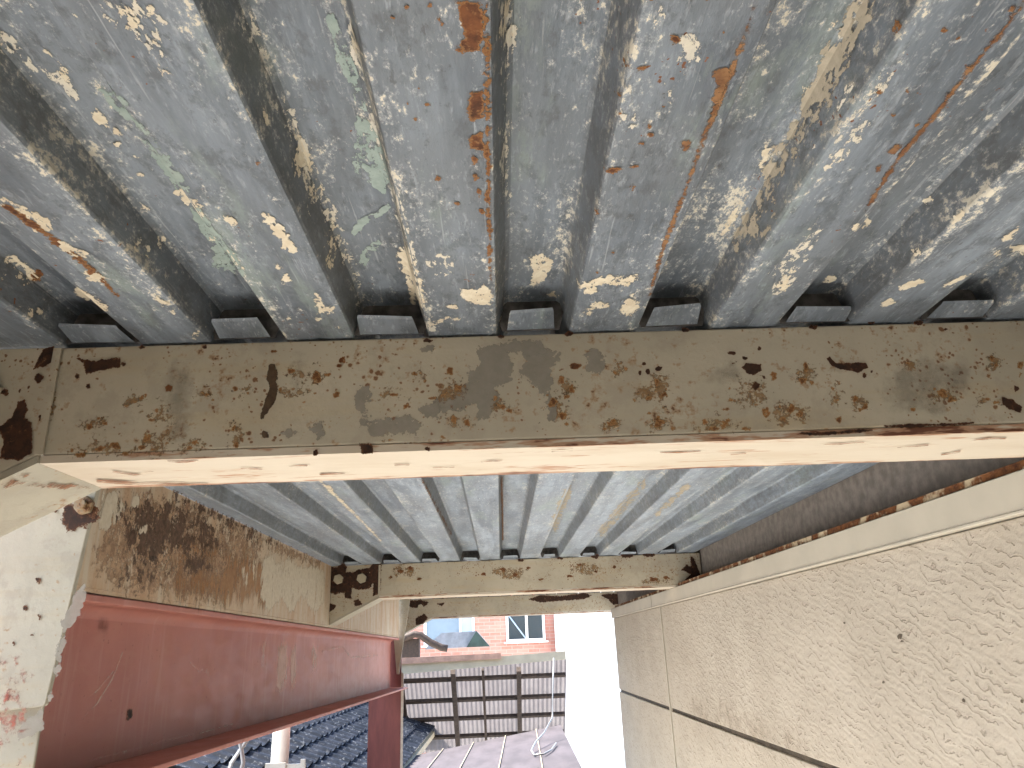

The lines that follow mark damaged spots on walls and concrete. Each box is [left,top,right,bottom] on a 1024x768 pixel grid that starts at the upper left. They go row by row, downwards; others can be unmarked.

peeling [100,0,170,76]
peeling [238,9,494,332]
rust [456,1,494,281]
peeling [720,0,875,253]
peeling [0,197,89,258]
peeling [576,274,641,316]
peeling [768,223,823,296]
rust [0,346,56,461]
rust [260,350,346,438]
rust [693,351,974,436]
rust [54,489,422,612]
rust [529,593,618,605]